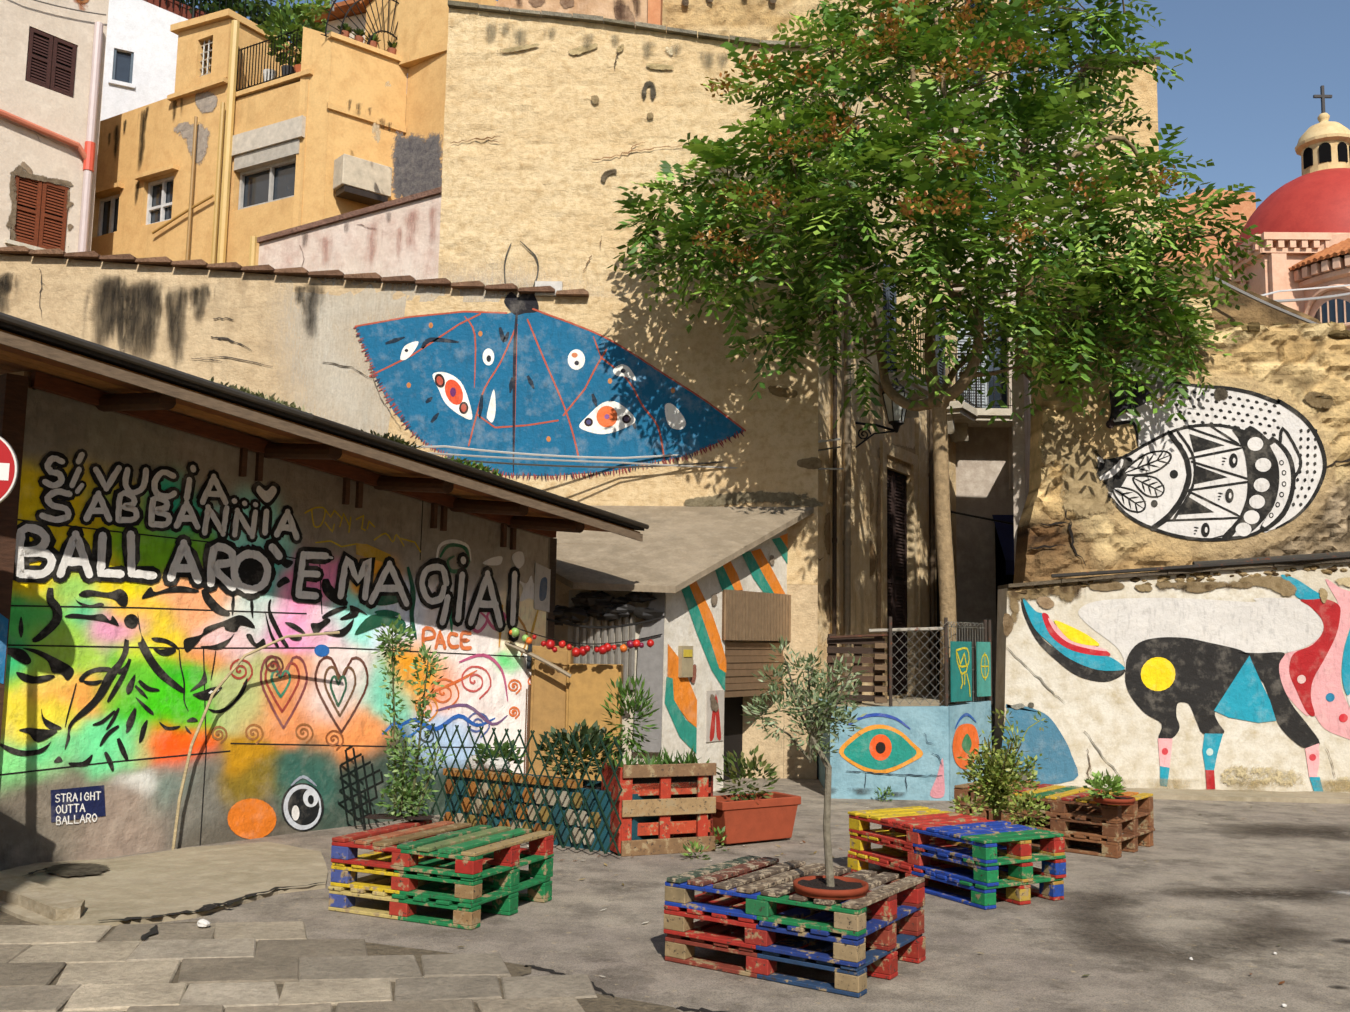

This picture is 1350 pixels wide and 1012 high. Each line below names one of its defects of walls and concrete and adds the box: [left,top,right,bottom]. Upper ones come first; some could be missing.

spalling [529,0,574,8]
water stain [108,107,148,164]
spalling [174,92,218,165]
spalling [372,123,443,199]
spalling [6,162,74,247]
water stain [0,273,10,308]
water stain [96,277,206,356]
water stain [298,286,318,328]
crack [1326,458,1350,467]
spalling [1002,564,1350,636]
spalling [1221,766,1303,787]